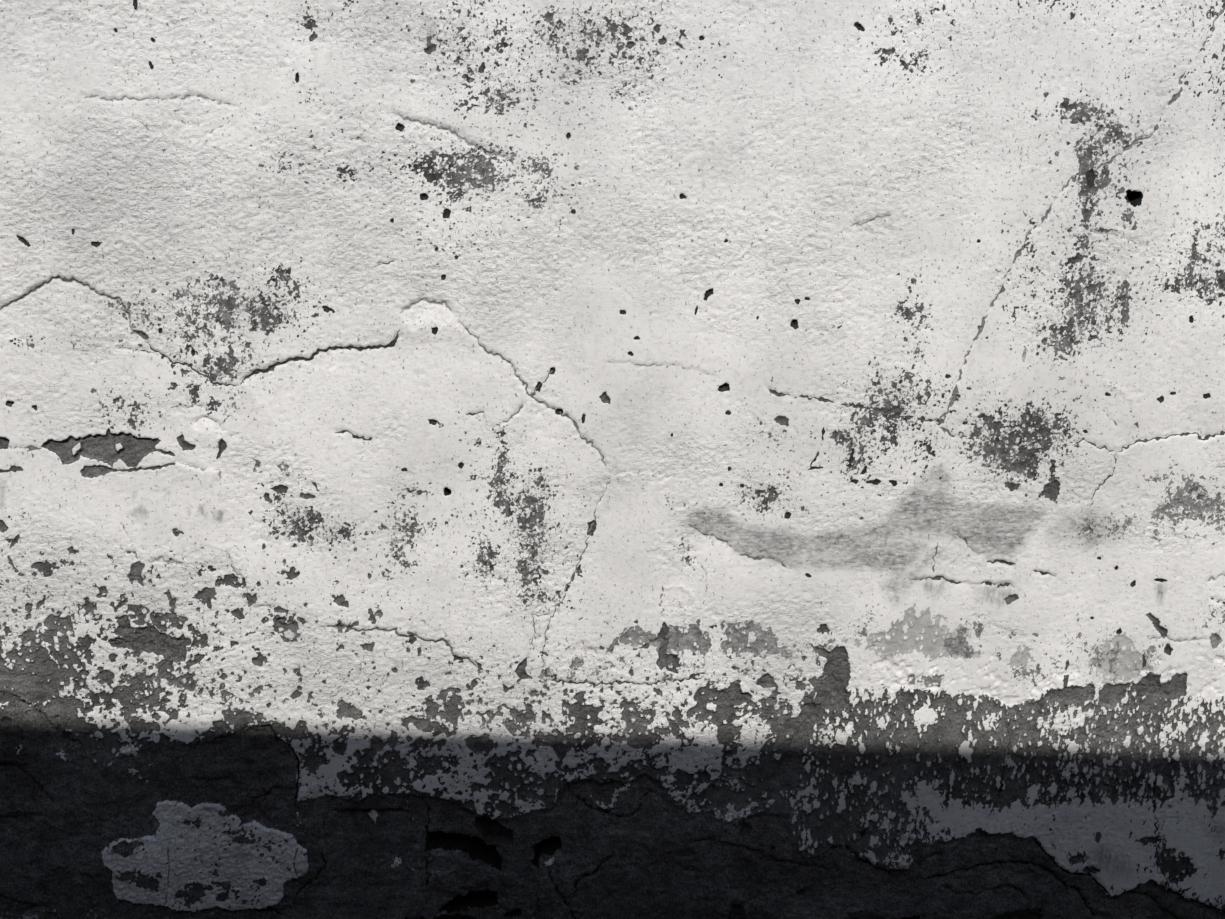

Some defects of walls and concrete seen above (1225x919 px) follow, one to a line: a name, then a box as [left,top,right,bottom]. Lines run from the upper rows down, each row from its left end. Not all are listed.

crack [1203,6,1225,47]
crack [0,275,702,686]
spalling [0,411,1225,919]
crack [767,71,1186,467]
crack [1076,385,1225,507]